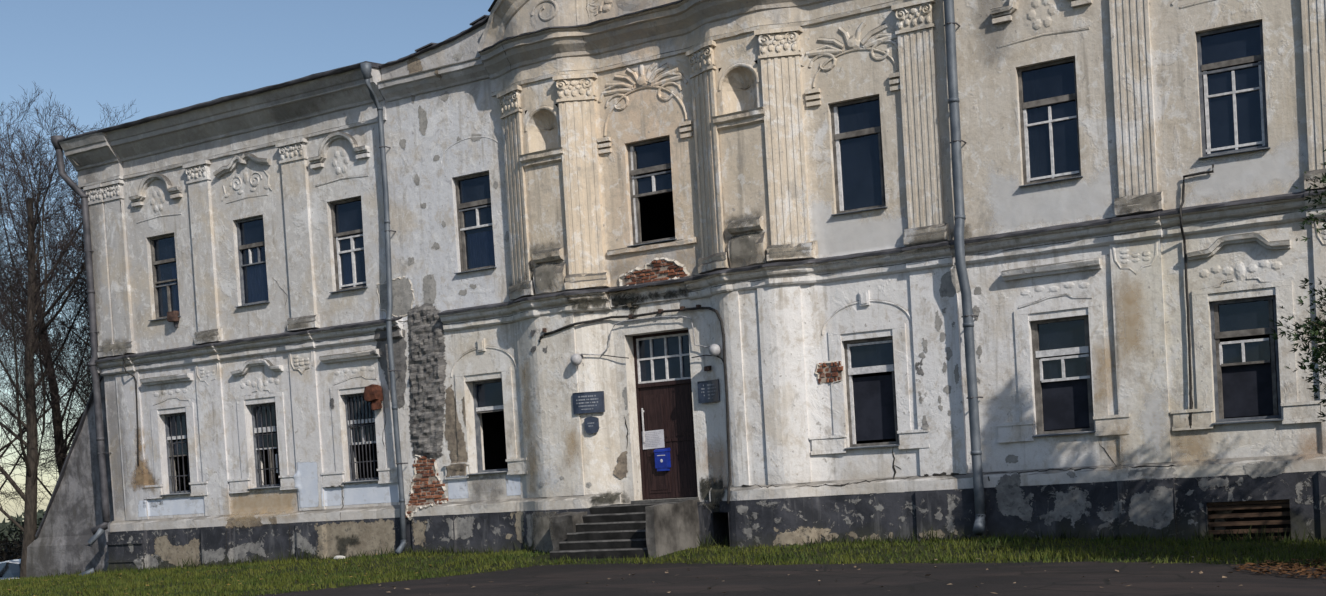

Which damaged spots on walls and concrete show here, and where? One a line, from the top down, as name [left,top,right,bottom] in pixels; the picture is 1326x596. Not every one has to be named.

spalling [411,95,428,135]
spalling [618,257,690,291]
spalling [370,257,436,410]
spalling [814,361,843,384]
peeling [127,516,277,570]
peeling [291,384,481,559]
peeling [736,498,917,546]
peeling [912,494,958,540]
peeling [995,455,1287,530]
peeling [1294,481,1326,505]